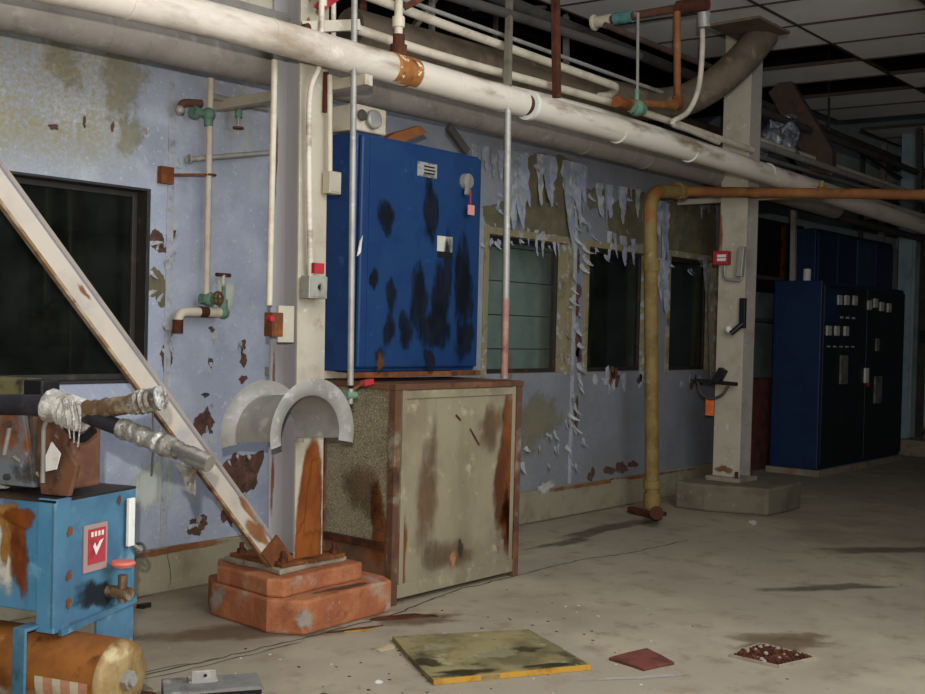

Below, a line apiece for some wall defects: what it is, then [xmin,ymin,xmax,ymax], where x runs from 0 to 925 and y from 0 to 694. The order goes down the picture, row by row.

peeling [145,229,179,308]
peeling [479,152,645,428]
peeling [160,321,174,372]
peeling [193,406,215,437]
peeling [222,450,264,495]
peeling [587,460,638,482]
peeling [187,514,208,536]